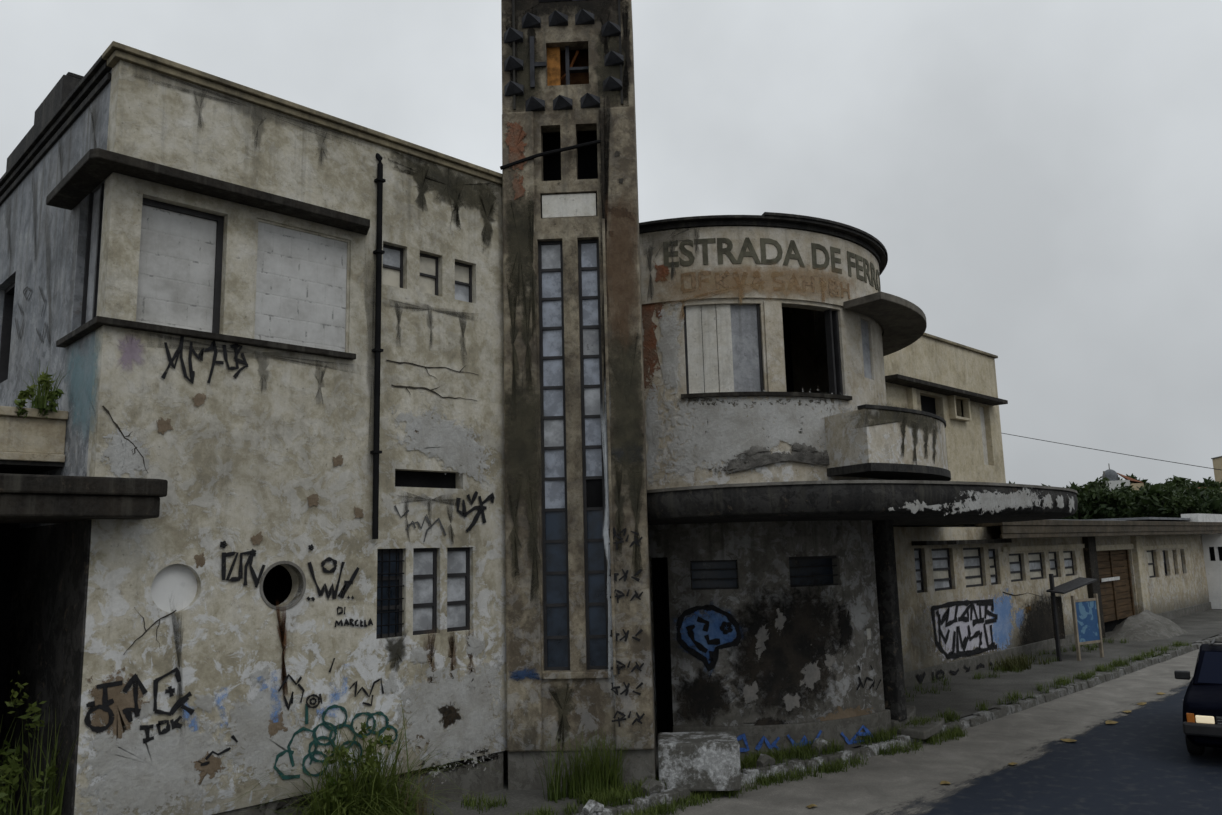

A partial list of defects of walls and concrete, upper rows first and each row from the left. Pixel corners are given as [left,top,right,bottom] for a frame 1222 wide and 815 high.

crack [386,360,478,401]
leakage [394,151,545,599]
peeling [642,302,857,487]
leakage [851,405,939,462]
peeling [888,487,1075,516]
corrosion [277,608,288,695]
peeling [743,681,759,704]
leakage [676,585,853,726]
peeling [755,608,786,658]
peeling [782,650,835,712]